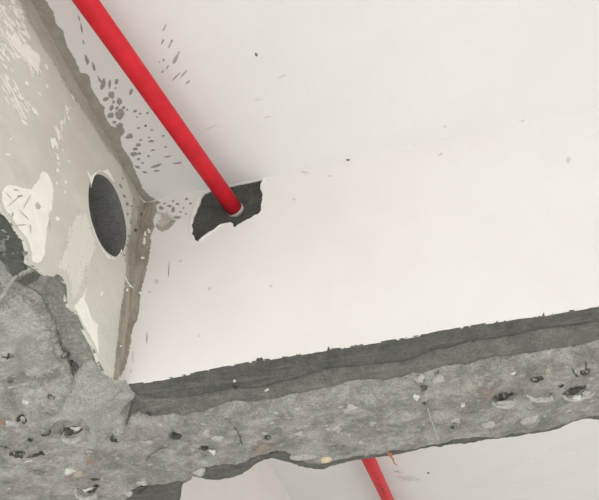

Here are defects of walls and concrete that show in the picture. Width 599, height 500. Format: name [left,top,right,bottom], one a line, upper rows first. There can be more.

spalling [0,169,599,500]